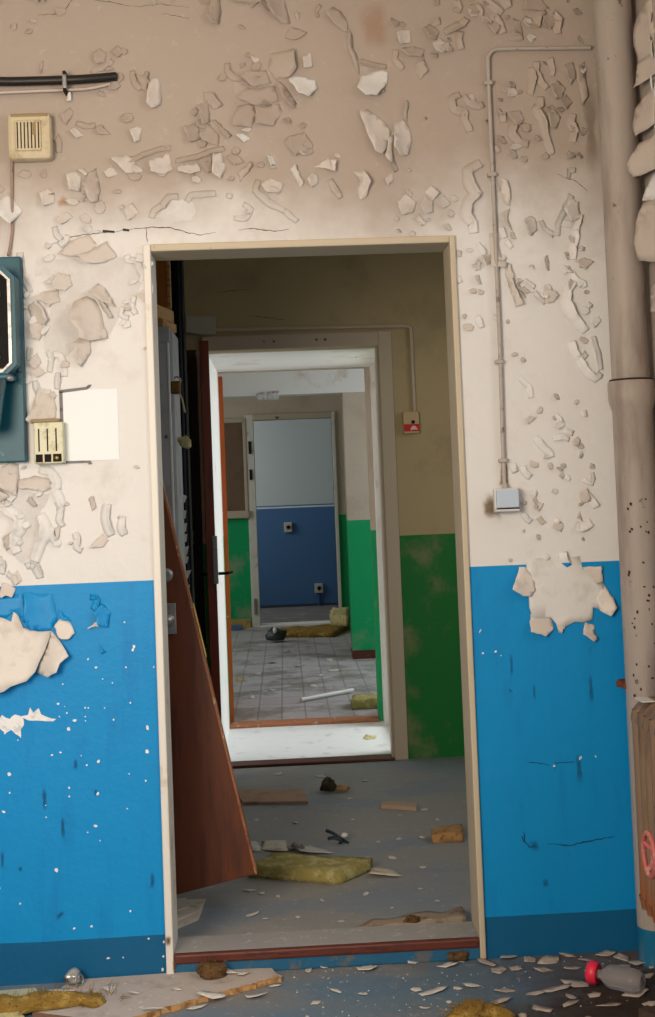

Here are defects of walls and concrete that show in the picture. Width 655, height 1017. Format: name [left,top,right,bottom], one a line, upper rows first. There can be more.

peeling [0,185,22,224]
peeling [16,0,343,424]
peeling [354,171,371,200]
peeling [360,100,412,185]
peeling [394,159,604,383]
peeling [447,57,589,179]
peeling [627,0,655,262]
peeling [509,376,600,541]
peeling [0,463,128,693]
peeling [508,551,617,642]
spalling [0,703,89,741]